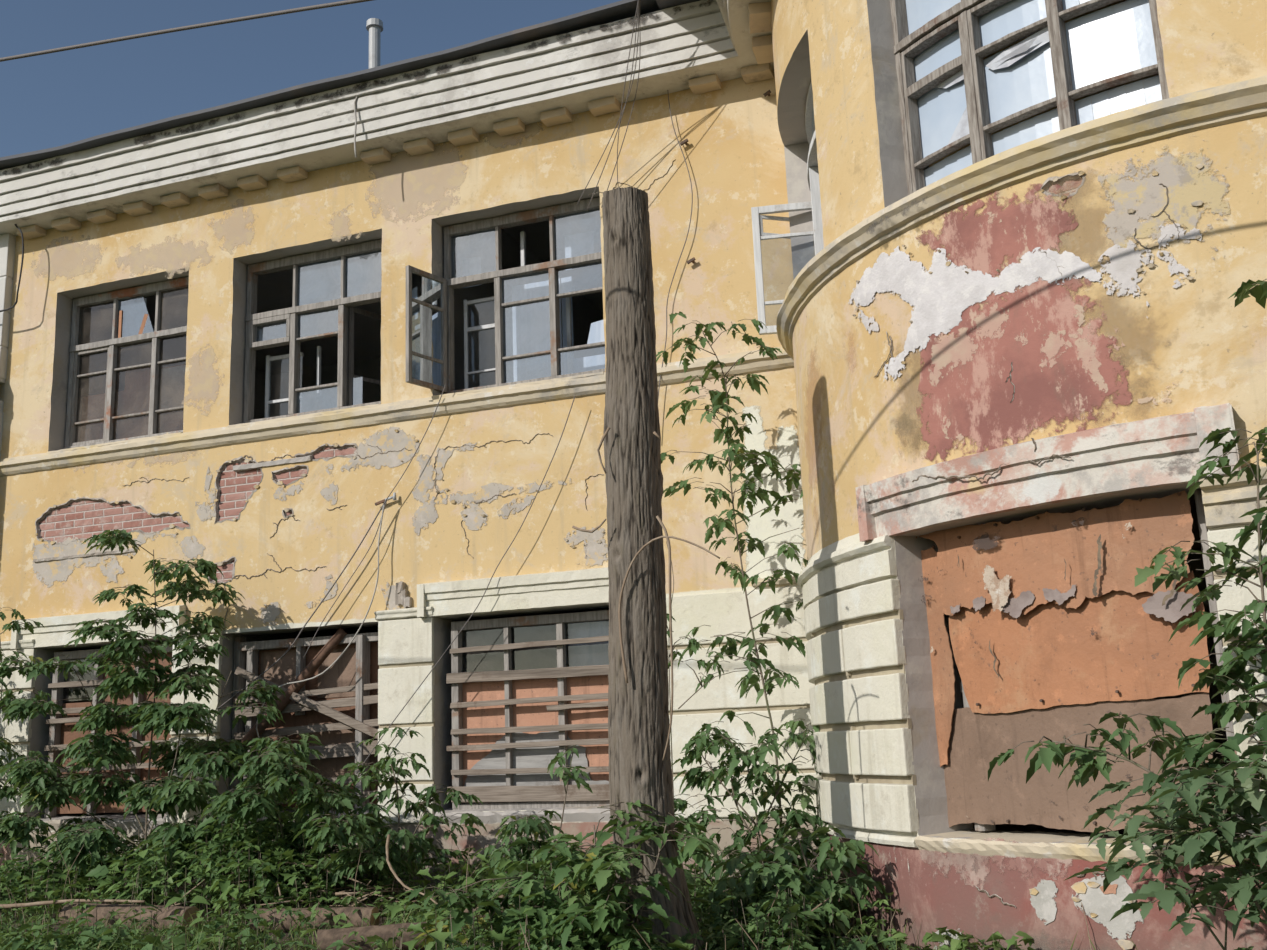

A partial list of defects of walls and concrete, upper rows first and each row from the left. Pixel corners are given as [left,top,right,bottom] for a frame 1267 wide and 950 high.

peeling [848,146,1230,464]
spalling [31,426,572,588]
peeling [563,527,608,567]
peeling [1029,875,1143,950]